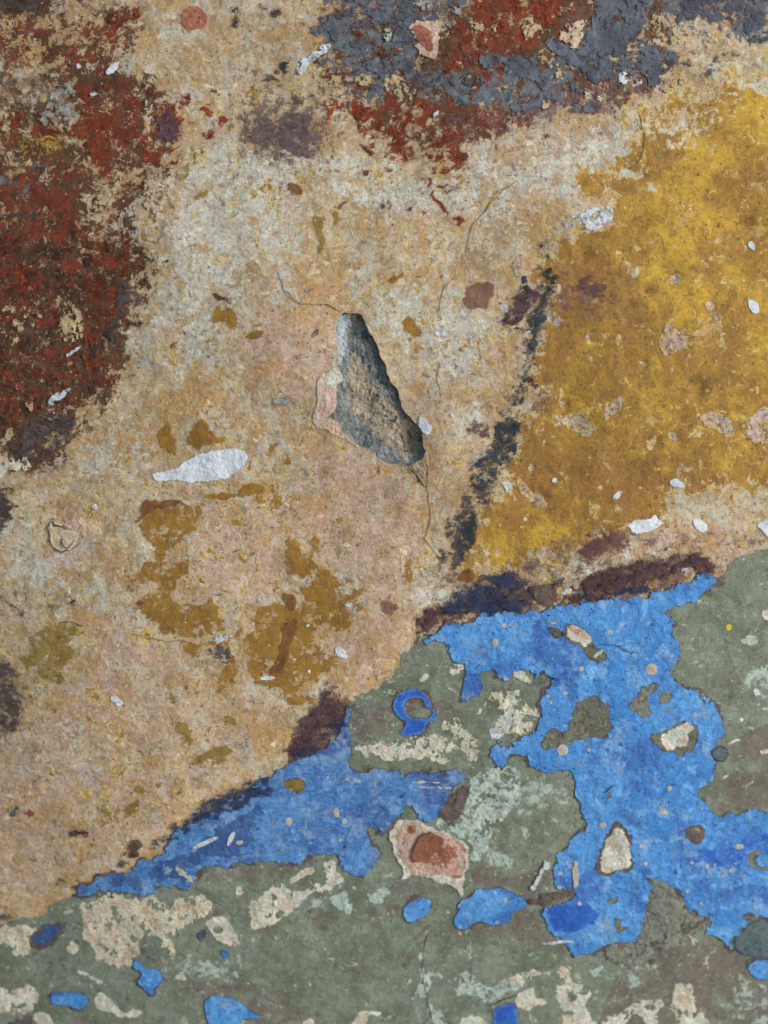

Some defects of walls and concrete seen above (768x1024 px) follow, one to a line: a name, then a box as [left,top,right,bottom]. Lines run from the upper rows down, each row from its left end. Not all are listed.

peeling [308,0,768,194]
peeling [0,6,180,443]
peeling [0,457,31,478]
flaking render [313,313,428,486]
peeling [0,573,768,1024]